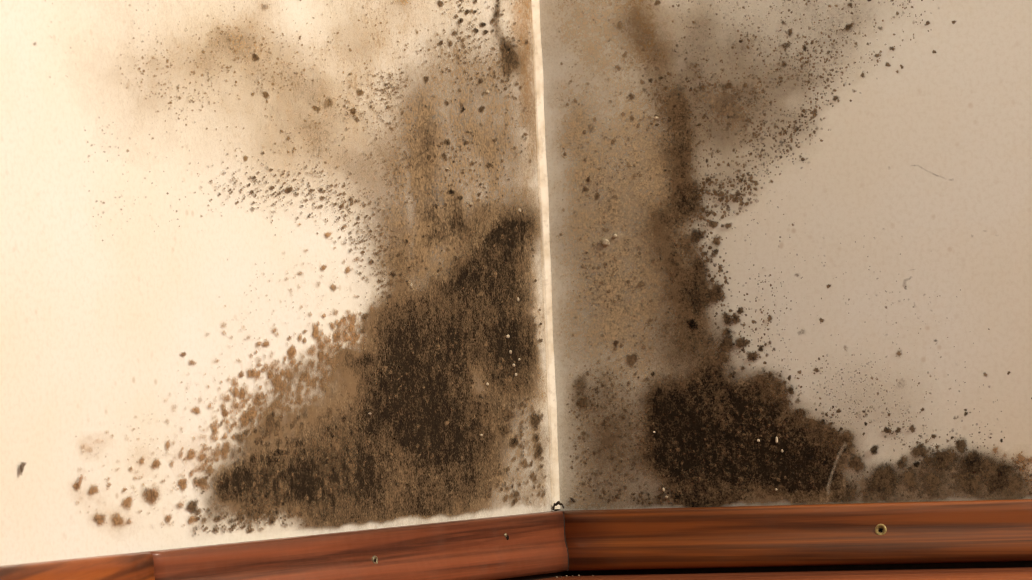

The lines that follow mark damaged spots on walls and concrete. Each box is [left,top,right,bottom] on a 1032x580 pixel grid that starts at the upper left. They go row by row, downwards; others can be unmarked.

damp [120,0,549,535]
damp [557,0,1032,509]